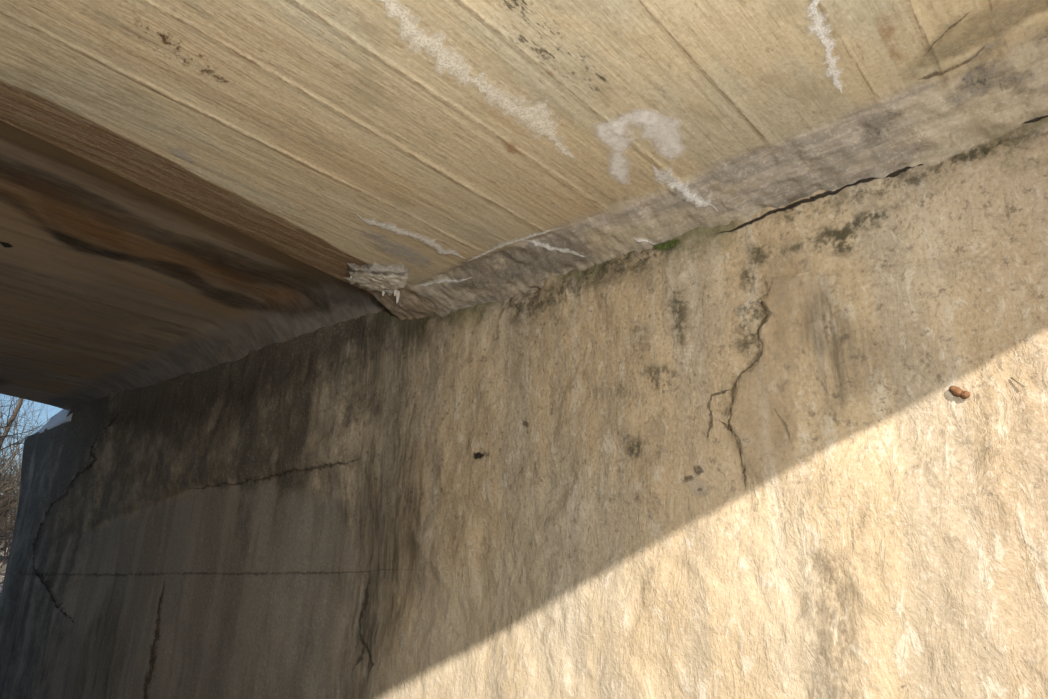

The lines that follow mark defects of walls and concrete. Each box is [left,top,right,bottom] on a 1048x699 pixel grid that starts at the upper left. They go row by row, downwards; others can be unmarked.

leakage [414,277,472,287]
leakage [354,212,585,265]
leakage [380,0,580,162]
leakage [596,110,718,212]
crack [713,164,923,235]
leakage [808,0,842,93]
crack [1021,115,1048,125]
crack [707,281,773,484]
crack [32,418,115,623]
crack [143,579,165,699]
crack [353,577,374,670]